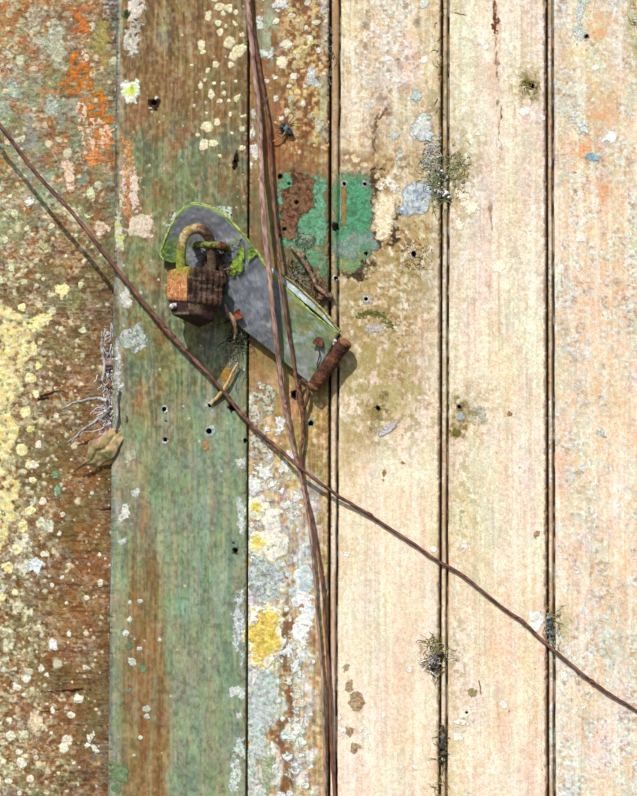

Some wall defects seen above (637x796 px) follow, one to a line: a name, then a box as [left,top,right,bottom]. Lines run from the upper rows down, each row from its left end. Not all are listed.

peeling [276,167,379,280]